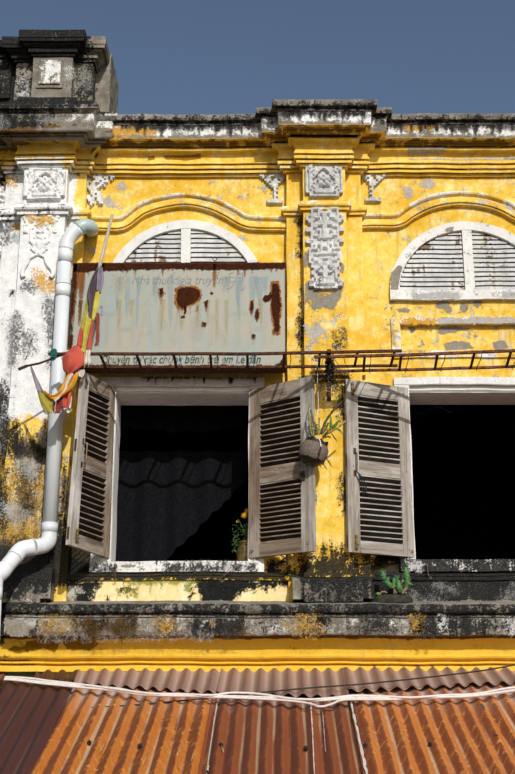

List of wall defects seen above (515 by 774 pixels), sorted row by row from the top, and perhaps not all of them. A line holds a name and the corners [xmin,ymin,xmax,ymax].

water stain [282,110,366,122]
peeling [11,214,55,233]
peeling [31,267,57,293]
peeling [391,265,402,290]
corrosion [69,262,286,349]
peeling [436,301,482,312]
water stain [6,294,55,369]
peeling [438,326,474,350]
water stain [0,378,48,530]
water stain [373,555,423,572]
water stain [163,557,288,601]
water stain [0,615,140,666]